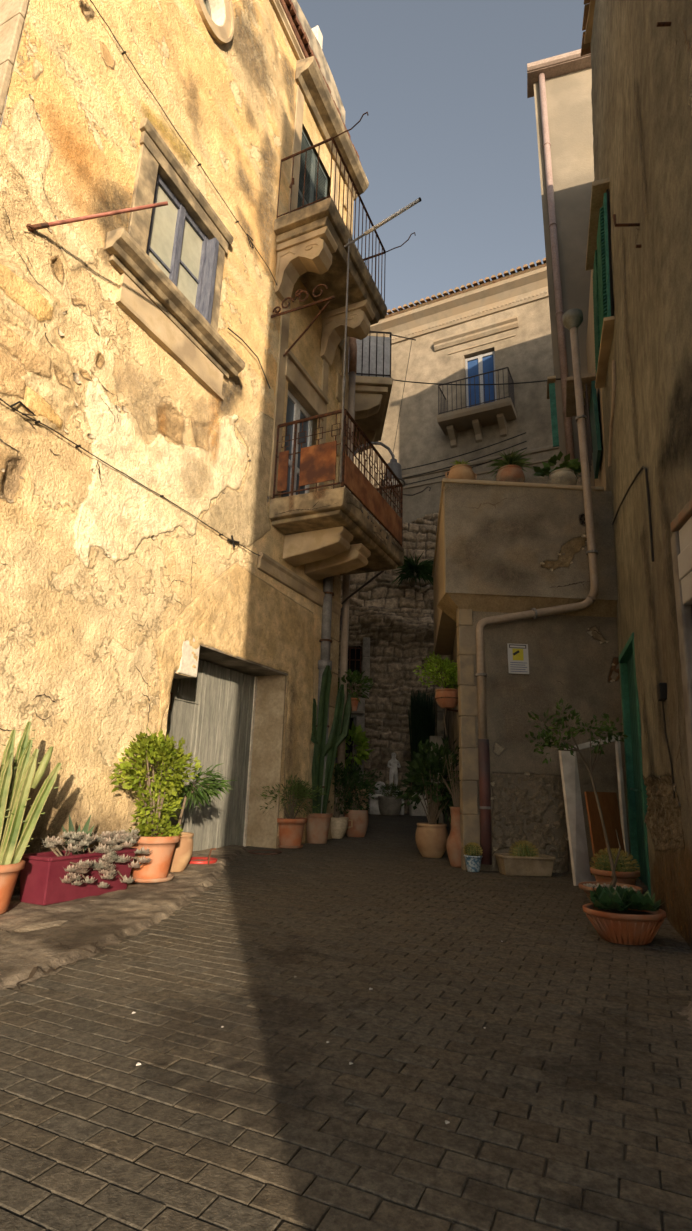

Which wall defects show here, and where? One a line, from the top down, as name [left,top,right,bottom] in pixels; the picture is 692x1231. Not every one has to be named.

peeling [8,94,95,284]
peeling [0,259,251,567]
crack [0,694,64,771]